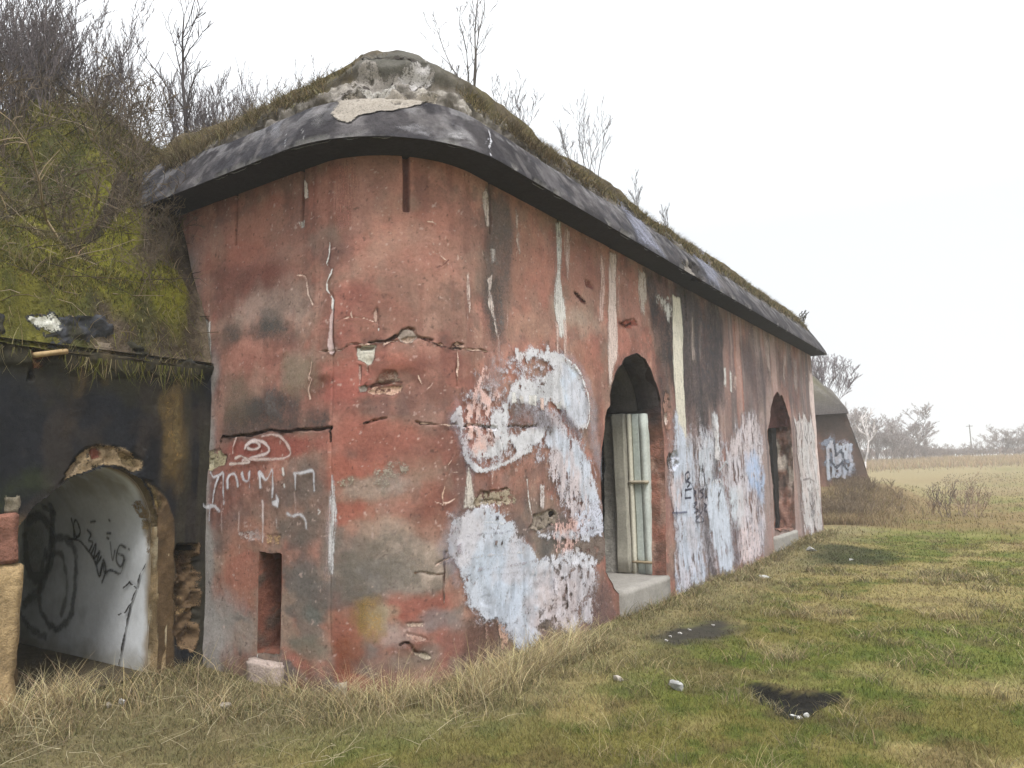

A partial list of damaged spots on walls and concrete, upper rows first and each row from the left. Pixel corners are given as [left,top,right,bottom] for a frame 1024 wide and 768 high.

spalling [330,55,440,122]
crack [220,426,333,442]
spalling [356,345,403,395]
damp [483,190,520,345]
efflorescence [554,223,570,356]
efflorescence [599,252,620,384]
damp [638,270,821,524]
spalling [64,444,163,553]
peeling [472,487,516,506]
spalling [530,509,558,532]
spalling [173,542,202,653]